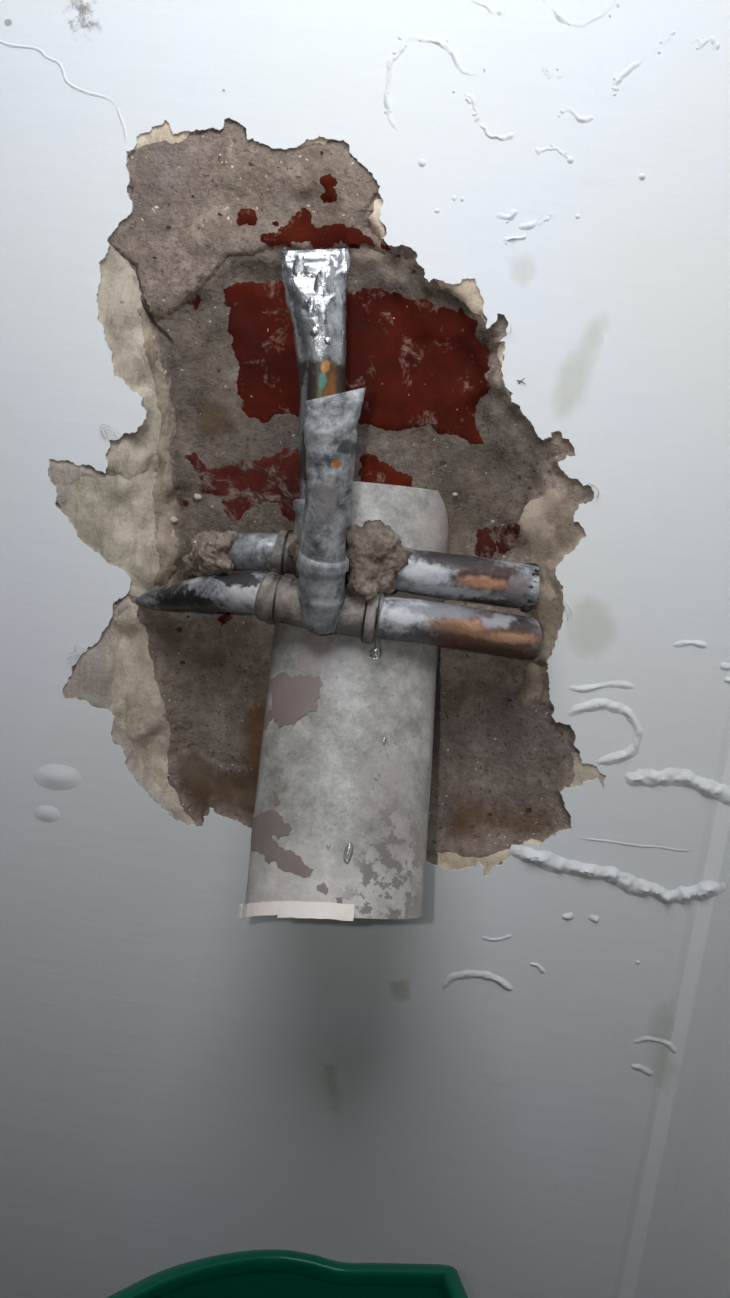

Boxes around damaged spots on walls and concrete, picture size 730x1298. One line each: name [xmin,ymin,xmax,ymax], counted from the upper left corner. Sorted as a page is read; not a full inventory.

crack [0,40,127,141]
flaking render [49,118,606,904]